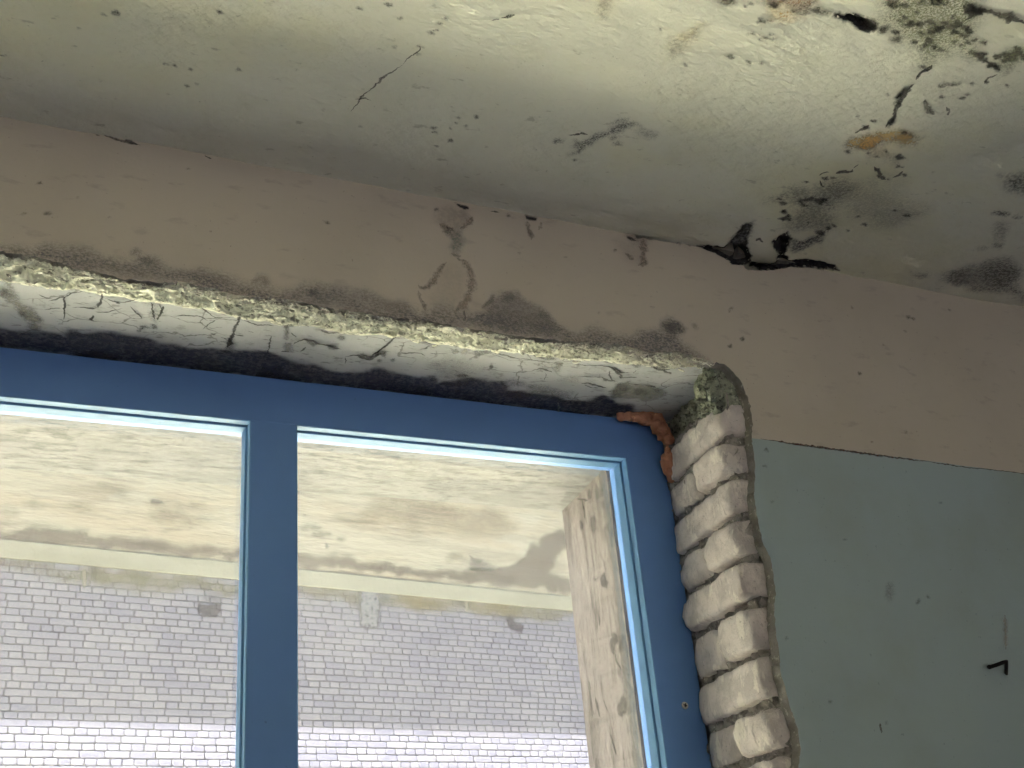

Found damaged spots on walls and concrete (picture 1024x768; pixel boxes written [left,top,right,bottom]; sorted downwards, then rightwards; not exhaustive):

crack [351,48,421,111]
crack [698,222,840,271]
crack [40,291,447,363]
crack [521,358,672,388]
flaking render [0,254,792,768]